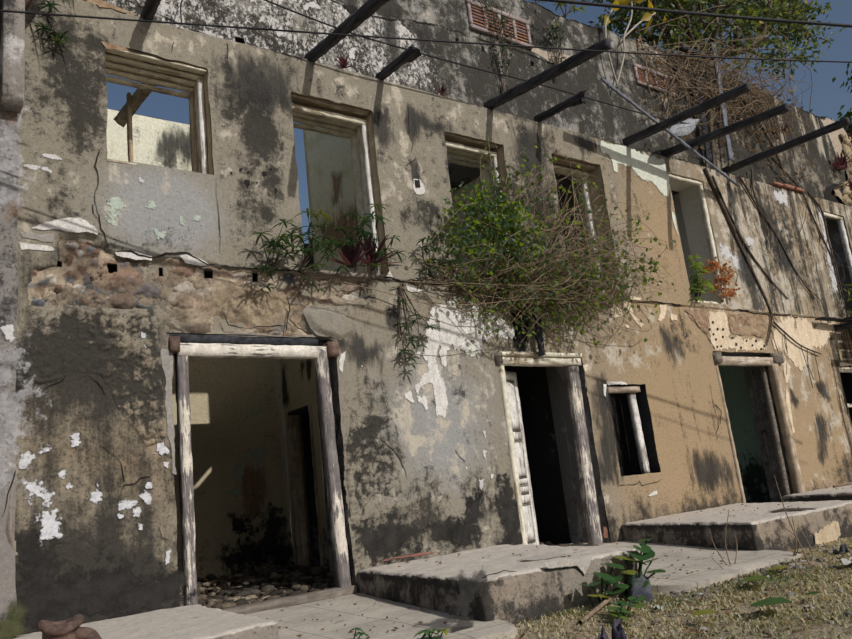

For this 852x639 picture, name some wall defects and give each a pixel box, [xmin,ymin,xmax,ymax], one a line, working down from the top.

water stain [405,106,451,140]
peeling [600,141,670,196]
peeling [103,196,130,230]
crack [92,146,306,275]
flaking render [19,217,370,336]
crack [223,297,335,339]
peeling [405,298,516,418]
peeling [658,303,836,433]
water stain [18,444,52,470]
water stain [0,479,196,639]
water stain [345,488,483,566]
water stain [495,473,526,545]